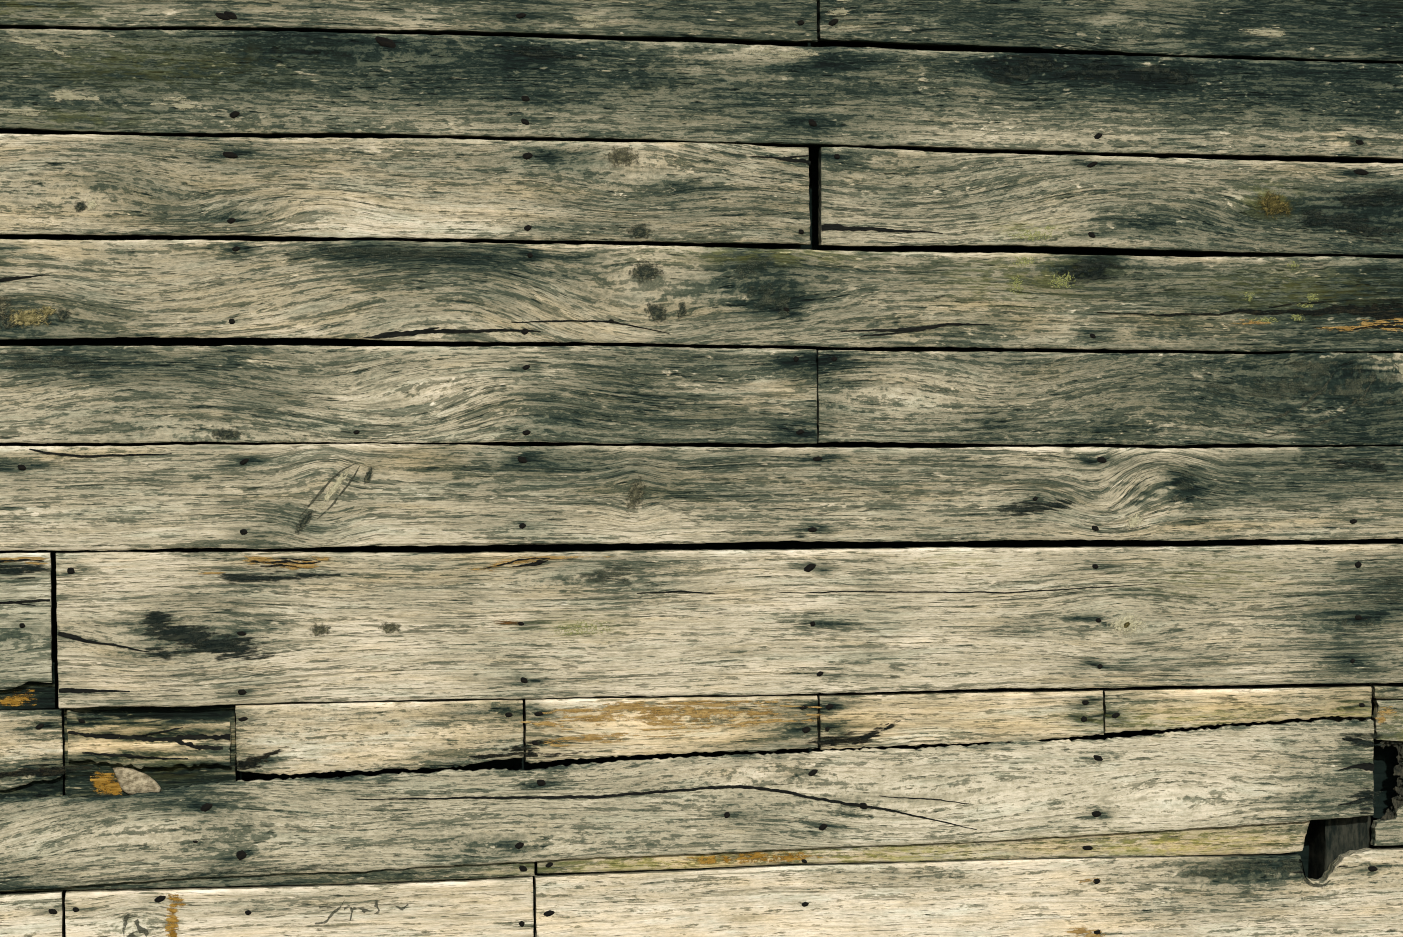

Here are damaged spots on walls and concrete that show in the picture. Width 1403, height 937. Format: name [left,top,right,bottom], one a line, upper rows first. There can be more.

rust [1319,318,1403,332]
leakage [128,611,274,661]
rust [90,771,122,795]
crack [357,785,977,830]
rust [165,894,186,937]